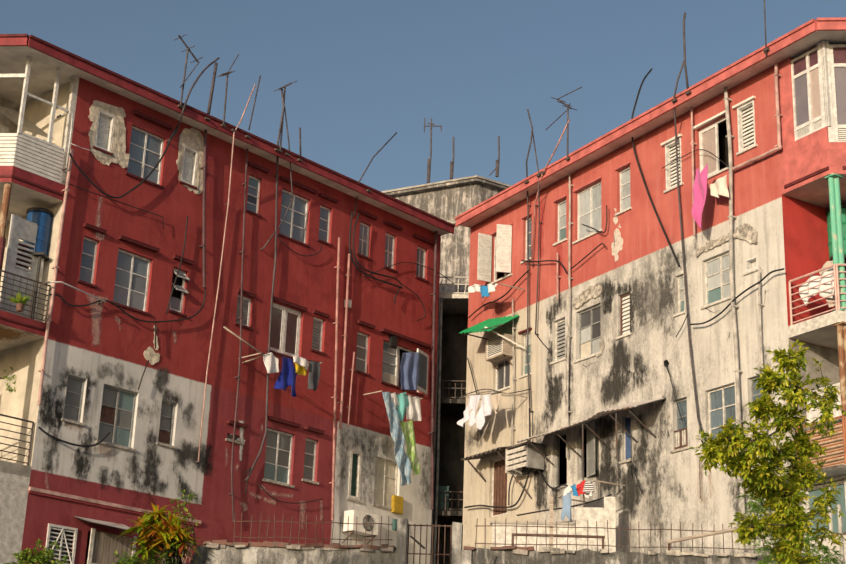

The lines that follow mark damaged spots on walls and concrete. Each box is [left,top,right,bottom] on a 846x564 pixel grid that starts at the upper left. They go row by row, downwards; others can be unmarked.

peeling [88,100,130,168]
peeling [176,127,204,195]
peeling [611,208,623,262]
leakage [602,252,678,333]
leakage [40,365,133,478]
leakage [153,369,179,403]
leakage [532,294,573,510]
leakage [601,338,645,405]
leakage [100,430,166,506]
leakage [173,443,212,502]
leakage [595,387,678,539]
leakage [243,547,257,564]